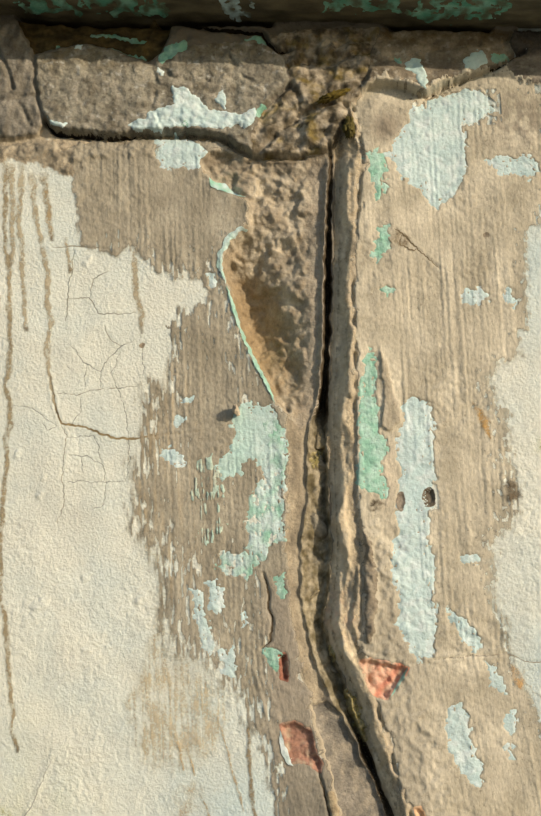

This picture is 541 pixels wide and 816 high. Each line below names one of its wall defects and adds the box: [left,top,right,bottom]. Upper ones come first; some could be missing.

spalling [0,23,68,139]
crack [46,123,136,142]
peeling [90,34,147,61]
peeling [322,0,512,23]
damp [0,163,58,752]
crack [14,245,180,523]
peeling [0,132,340,816]
peeling [128,27,541,816]
crack [263,110,406,816]
damp [129,634,237,785]
damp [239,728,257,816]
crack [434,653,540,663]